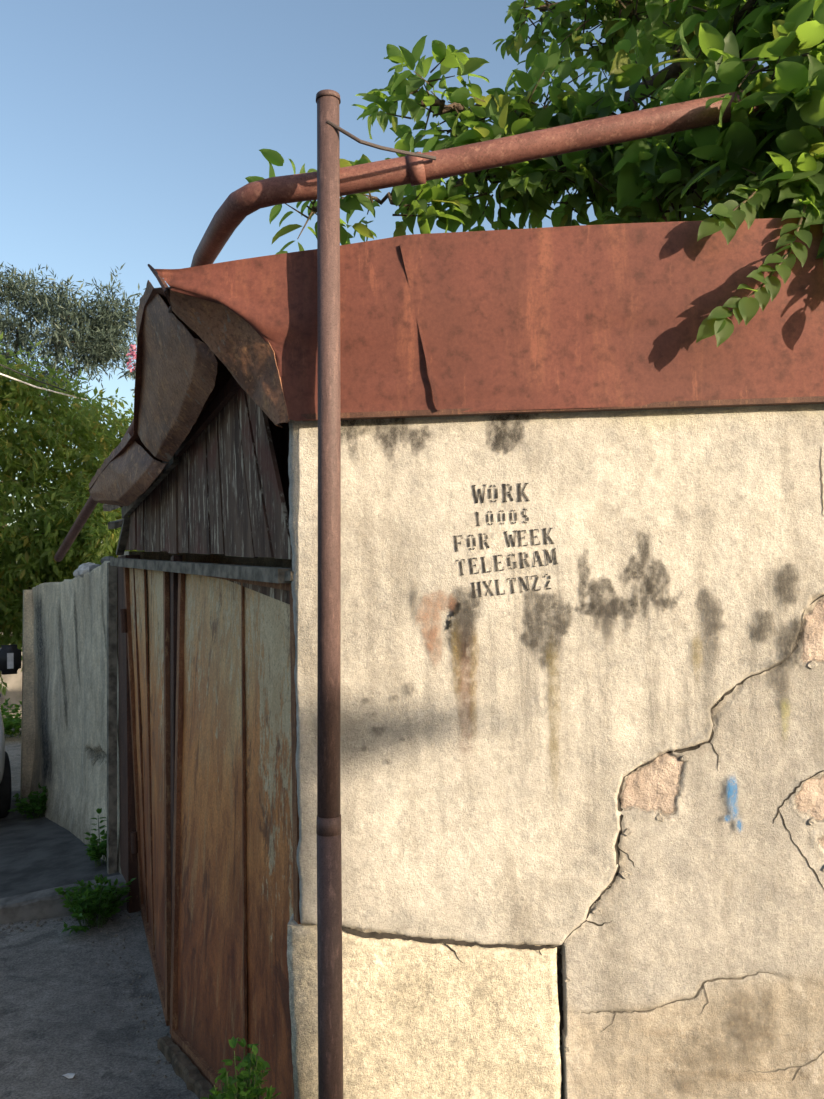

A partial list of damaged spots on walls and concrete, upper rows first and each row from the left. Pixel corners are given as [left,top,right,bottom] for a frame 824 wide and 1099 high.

water stain [341,418,429,449]
water stain [489,414,537,453]
crack [816,448,824,515]
water stain [523,536,677,665]
water stain [698,590,724,651]
water stain [753,611,806,694]
water stain [778,565,798,603]
flaking render [799,595,824,669]
flaking render [617,750,685,822]
flaking render [794,775,824,825]
crack [342,595,824,1093]